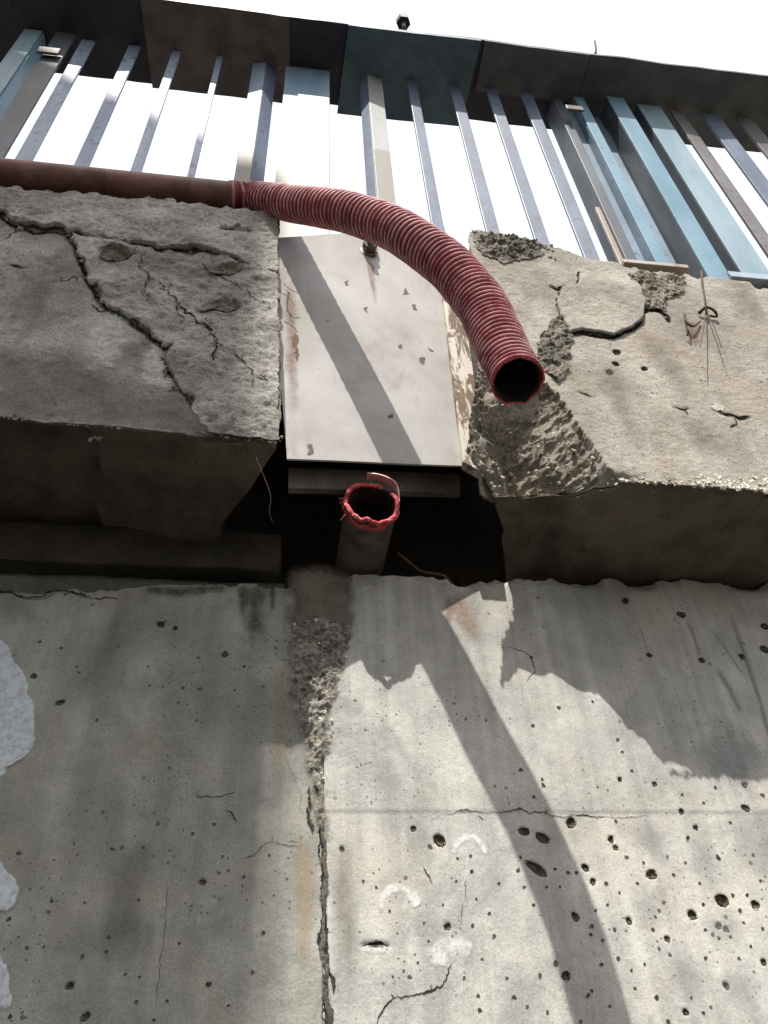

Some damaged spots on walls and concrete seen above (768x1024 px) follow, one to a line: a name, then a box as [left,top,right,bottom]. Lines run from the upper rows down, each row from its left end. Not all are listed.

crack [0,215,195,406]
crack [138,250,271,386]
spalling [473,231,546,263]
spalling [466,266,686,496]
crack [0,589,118,600]
crack [240,743,336,1020]
spalling [286,616,353,1024]
crack [430,808,647,821]
crack [377,962,453,1024]